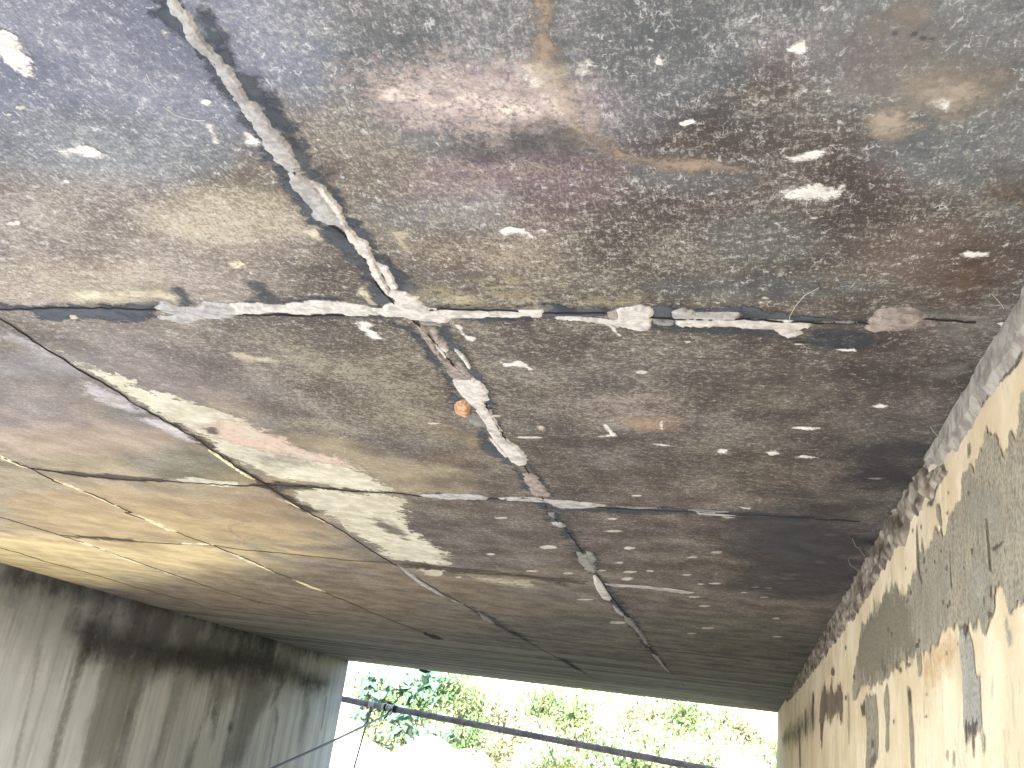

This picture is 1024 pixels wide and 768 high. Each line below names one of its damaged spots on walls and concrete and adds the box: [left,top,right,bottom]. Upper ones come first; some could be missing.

water stain [7,567,324,689]
peeling [3,334,545,589]
crack [0,0,870,687]
peeling [785,285,1024,749]
crack [922,316,976,324]